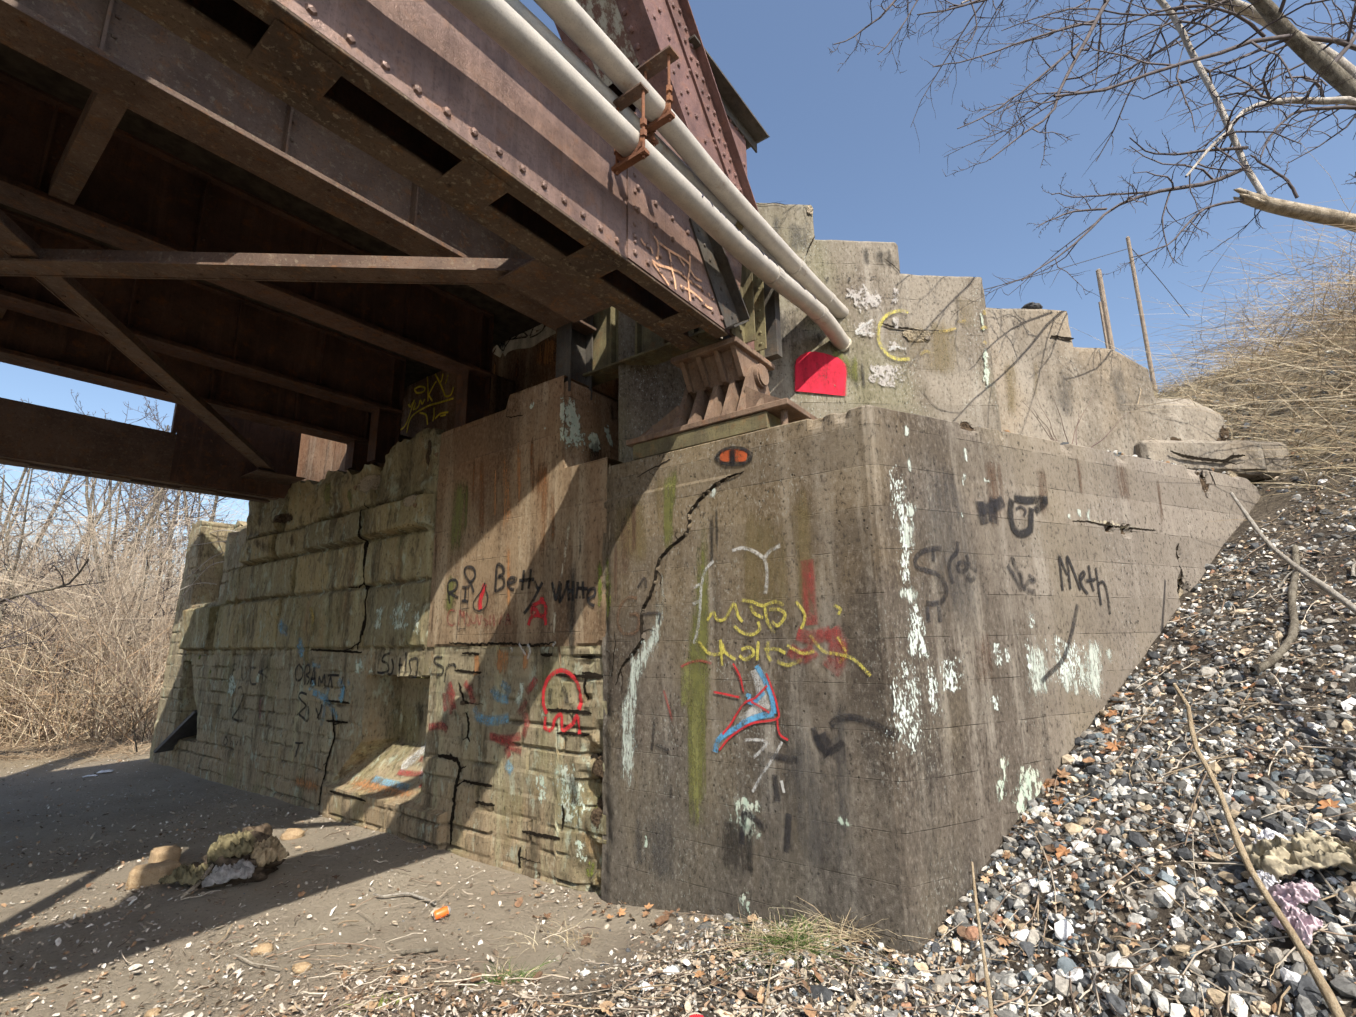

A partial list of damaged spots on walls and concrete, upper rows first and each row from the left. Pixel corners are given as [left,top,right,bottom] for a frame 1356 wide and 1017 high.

crack [449,637,556,647]
crack [611,471,744,688]
water stain [885,460,964,759]
crack [318,708,348,806]
crack [438,683,483,845]